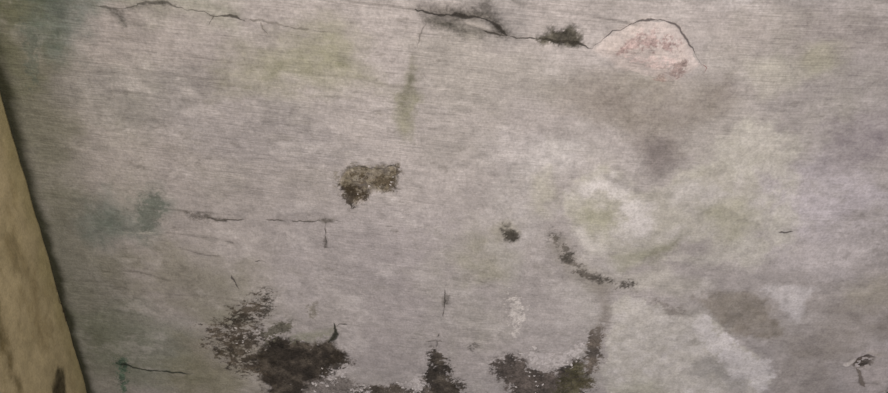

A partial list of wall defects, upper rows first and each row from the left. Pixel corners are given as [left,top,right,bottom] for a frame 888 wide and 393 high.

crack [103,0,245,30]
crack [411,0,592,51]
spalling [331,158,404,212]
crack [183,210,242,225]
crack [270,216,341,250]
damp [154,67,888,393]